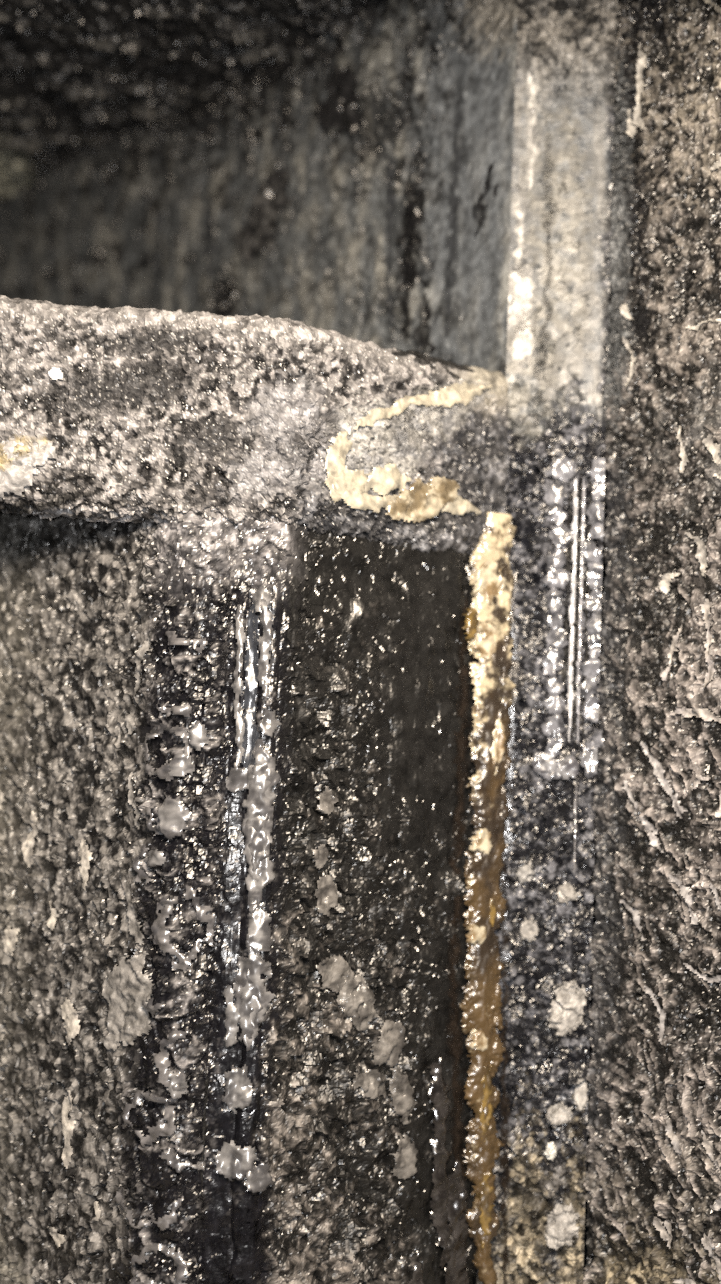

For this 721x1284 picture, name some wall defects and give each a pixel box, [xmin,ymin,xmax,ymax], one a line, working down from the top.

corrosion [448,512,518,1284]